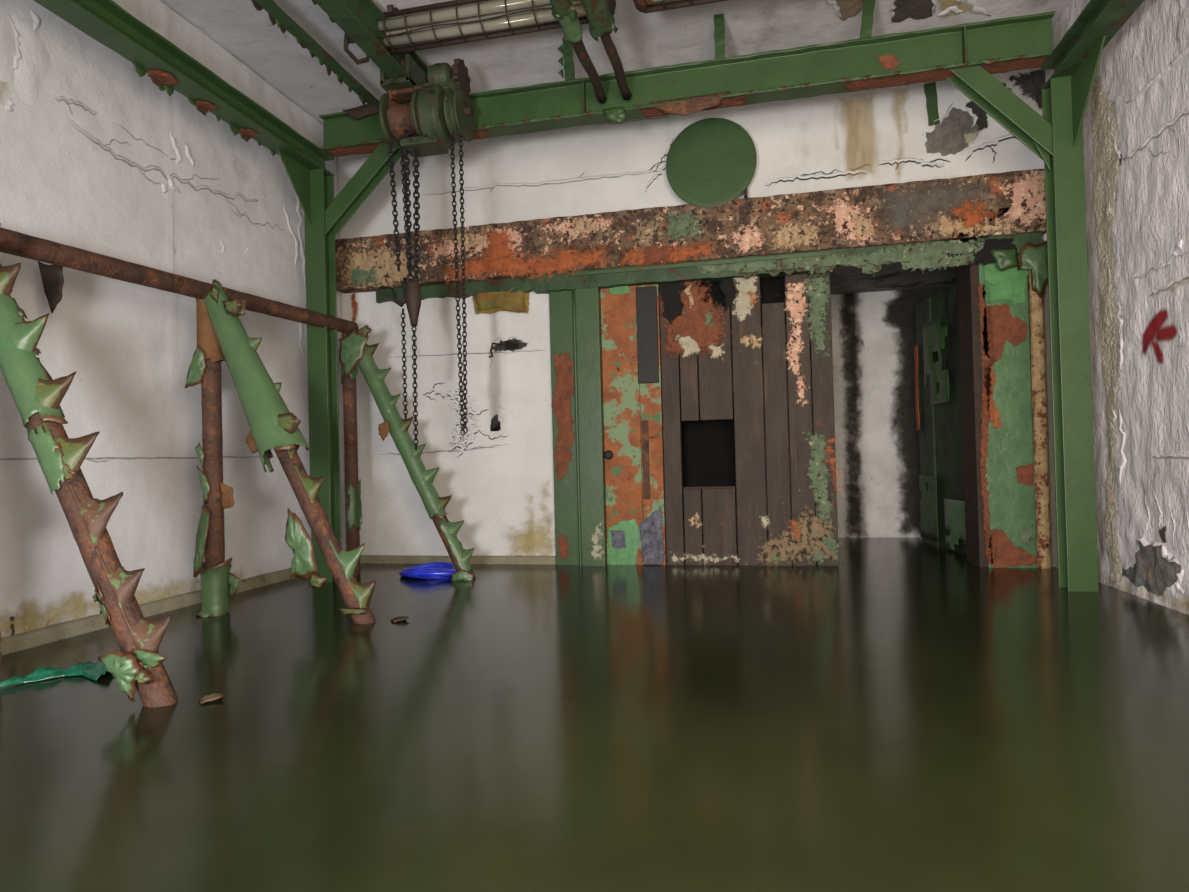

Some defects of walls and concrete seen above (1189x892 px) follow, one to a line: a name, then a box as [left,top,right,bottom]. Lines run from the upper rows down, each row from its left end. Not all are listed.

spalling [827,0,863,21]
spalling [888,0,991,23]
spalling [922,101,988,156]
crack [54,95,285,273]
rust [949,198,995,230]
rust [443,229,608,314]
rust [621,242,714,269]
peeling [1091,77,1189,596]
rust [551,352,575,480]
rust [558,534,569,559]